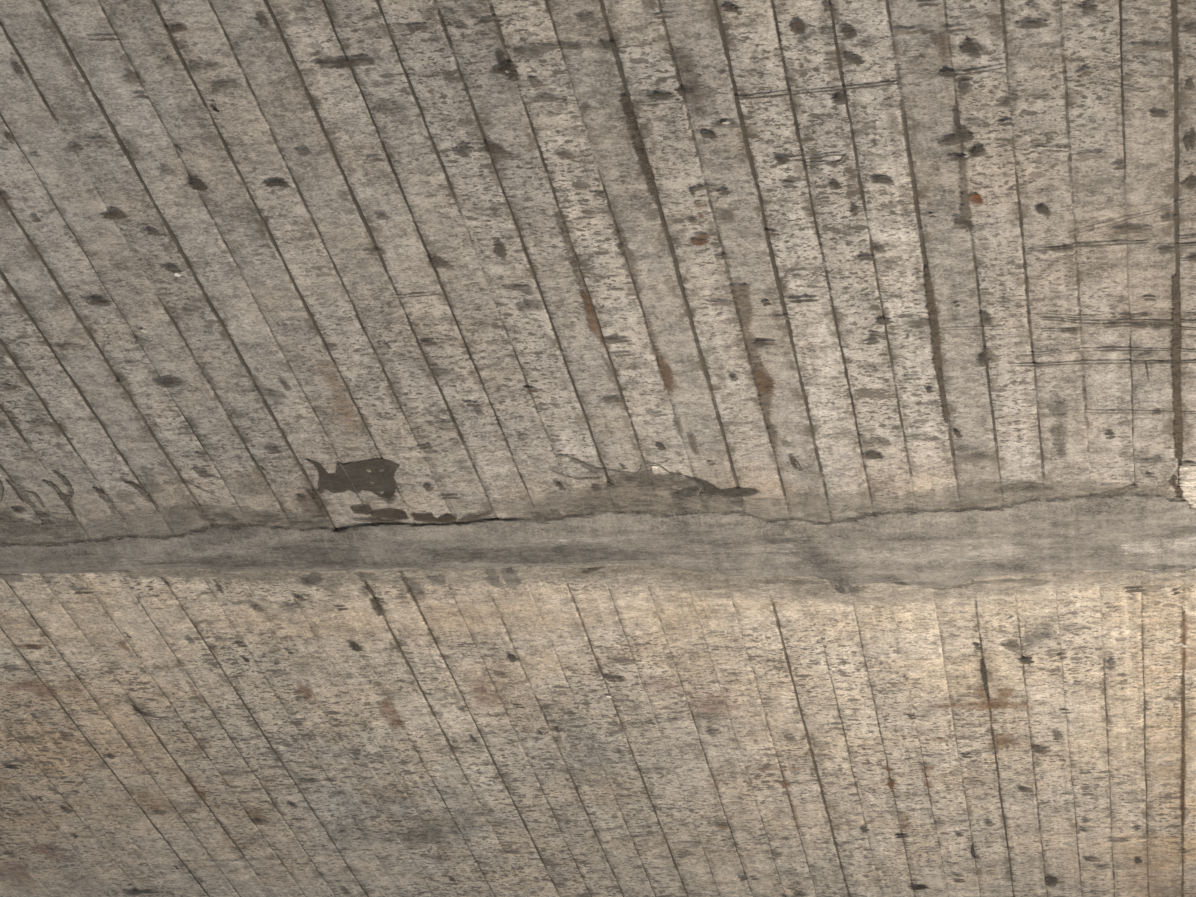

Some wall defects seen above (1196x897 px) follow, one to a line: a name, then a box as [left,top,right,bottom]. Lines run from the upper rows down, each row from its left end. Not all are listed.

leakage [0,471,87,534]